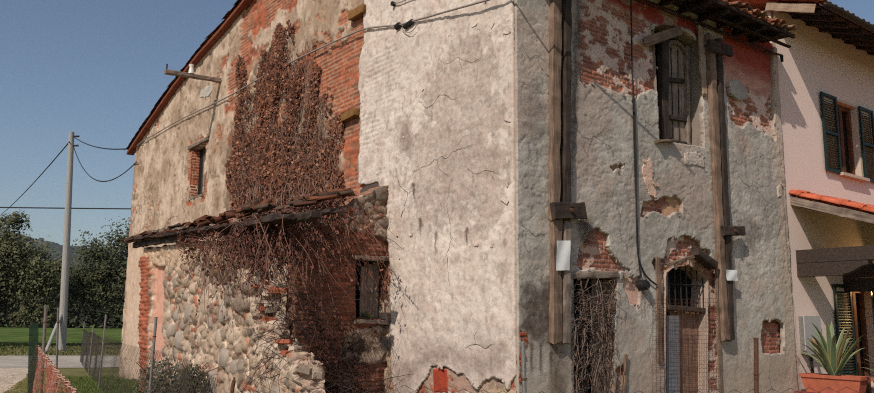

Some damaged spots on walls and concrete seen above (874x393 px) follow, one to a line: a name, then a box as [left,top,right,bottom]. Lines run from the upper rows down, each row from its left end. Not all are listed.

spalling [575,0,707,100]
spalling [722,26,777,139]
spalling [641,158,682,218]
spalling [573,228,639,308]
spalling [418,330,527,393]
spalling [652,236,717,393]
spalling [761,317,785,354]